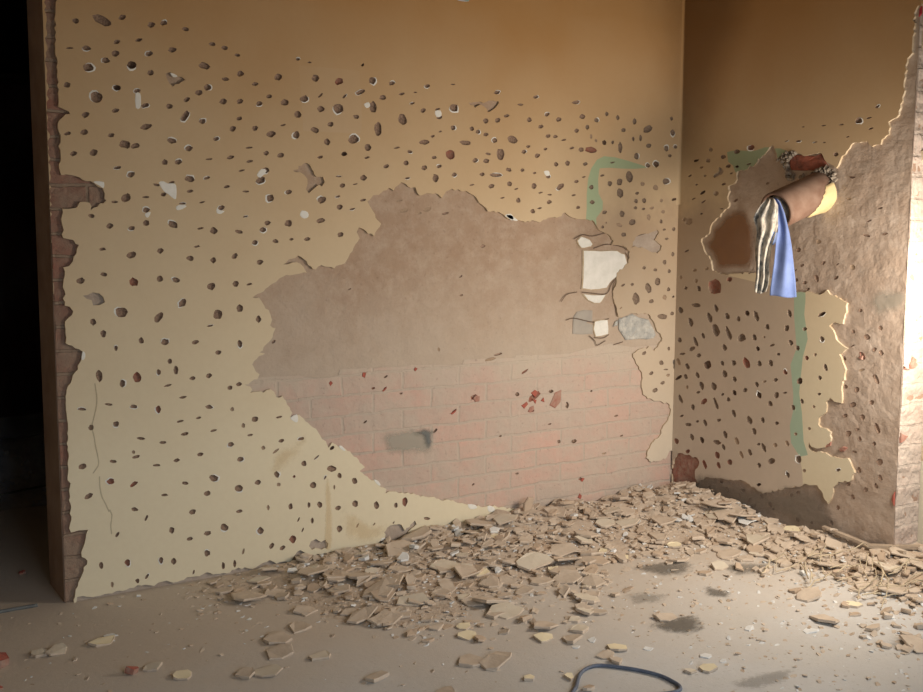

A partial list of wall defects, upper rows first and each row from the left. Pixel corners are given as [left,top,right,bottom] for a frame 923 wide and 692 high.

spalling [154,175,210,210]
spalling [252,77,386,159]
spalling [389,80,459,119]
spalling [421,150,455,182]
spalling [469,90,520,203]
spalling [527,100,677,189]
spalling [600,171,676,240]
crack [574,233,646,258]
crack [561,278,623,346]
spalling [120,372,141,387]
spalling [713,416,789,469]
spalling [310,465,341,489]